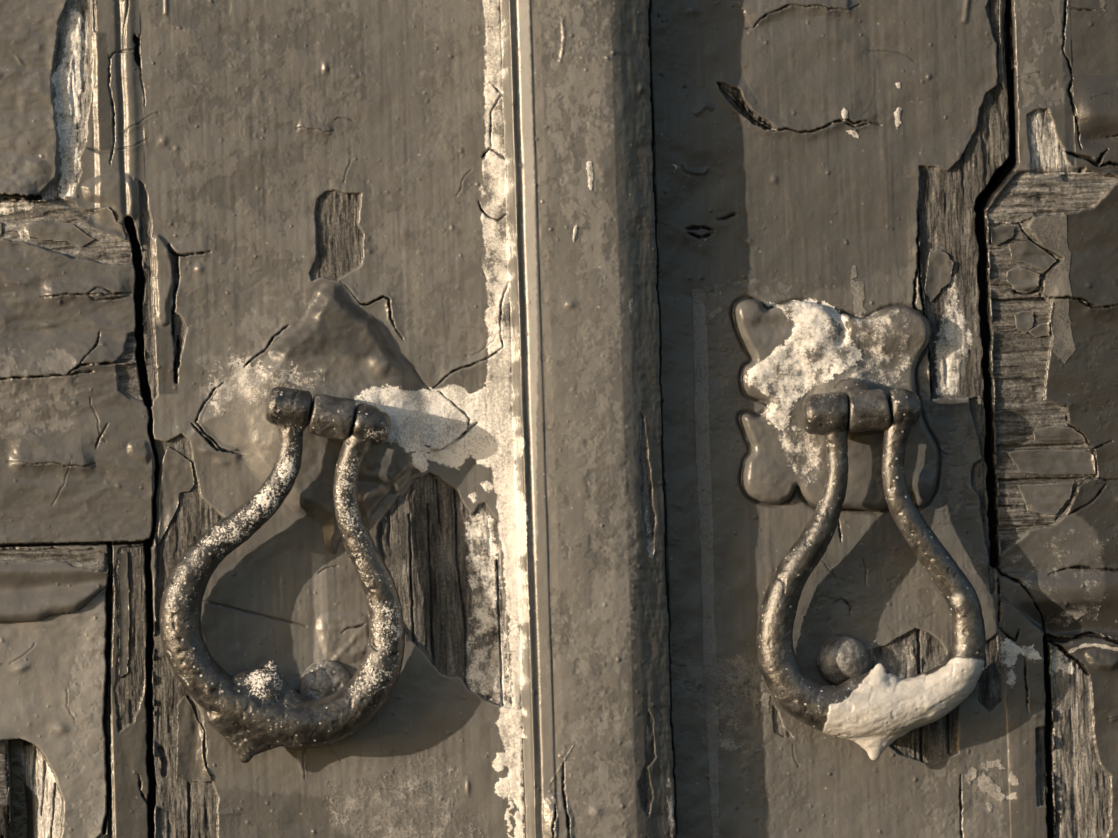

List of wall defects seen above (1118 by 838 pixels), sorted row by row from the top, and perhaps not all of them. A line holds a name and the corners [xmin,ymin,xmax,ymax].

peeling [0,0,157,405]
crack [0,218,158,838]
peeling [0,435,223,838]
crack [168,246,204,383]
peeling [311,191,363,280]
peeling [376,474,512,706]
crack [731,92,865,133]
peeling [917,0,1118,593]
crack [975,0,1118,838]
peeling [1036,647,1110,838]